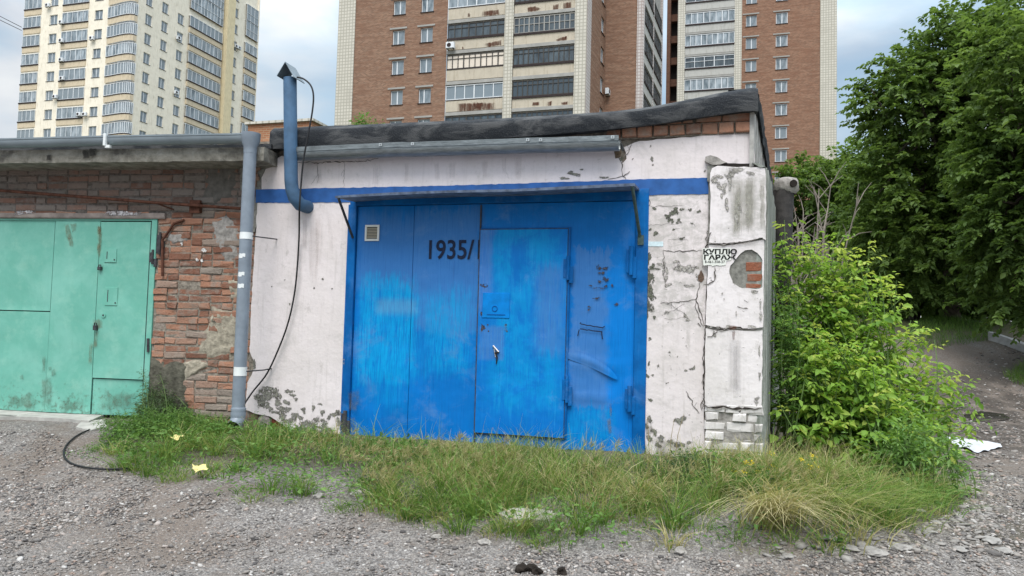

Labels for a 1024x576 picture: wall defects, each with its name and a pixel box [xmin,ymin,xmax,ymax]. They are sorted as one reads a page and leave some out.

peeling [167,233,189,246]
peeling [195,216,240,262]
peeling [652,207,701,240]
peeling [647,252,704,320]
crack [649,199,762,413]
peeling [249,386,341,434]